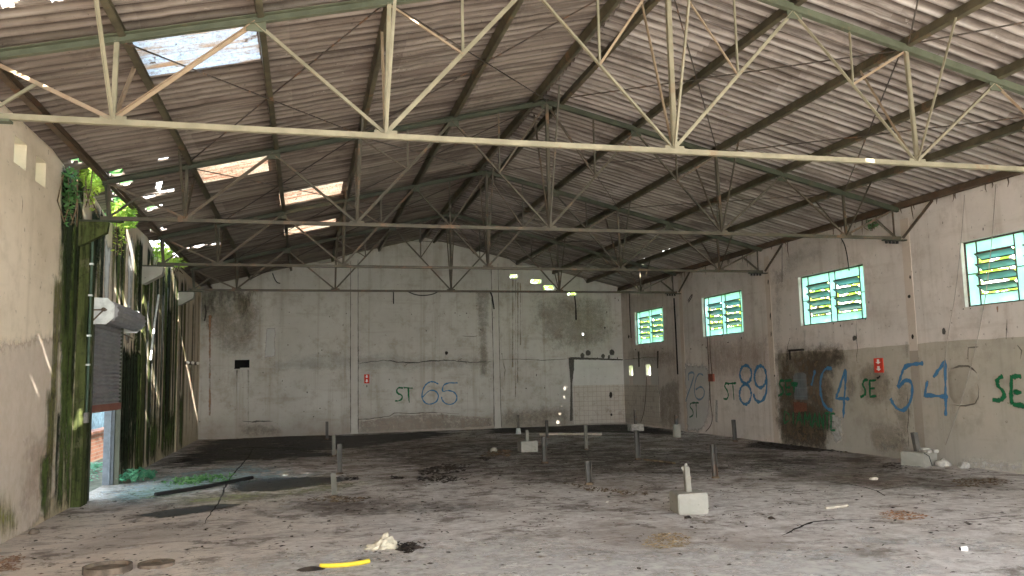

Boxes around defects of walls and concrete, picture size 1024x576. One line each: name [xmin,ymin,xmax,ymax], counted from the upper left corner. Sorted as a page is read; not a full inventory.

damp [747,351,843,451]
crack [205,449,253,524]